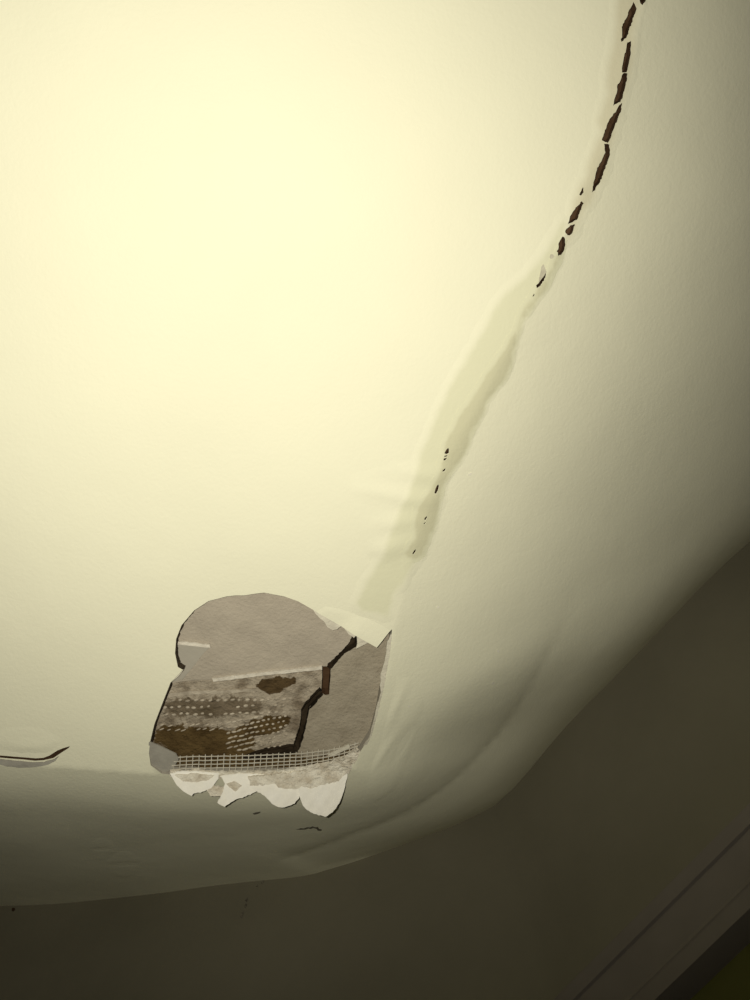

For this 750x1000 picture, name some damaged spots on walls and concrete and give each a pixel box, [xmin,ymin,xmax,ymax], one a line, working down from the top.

crack [533,0,646,296]
water stain [348,0,648,623]
peeling [0,746,70,768]
flaking render [149,604,348,817]
peeling [358,630,392,751]